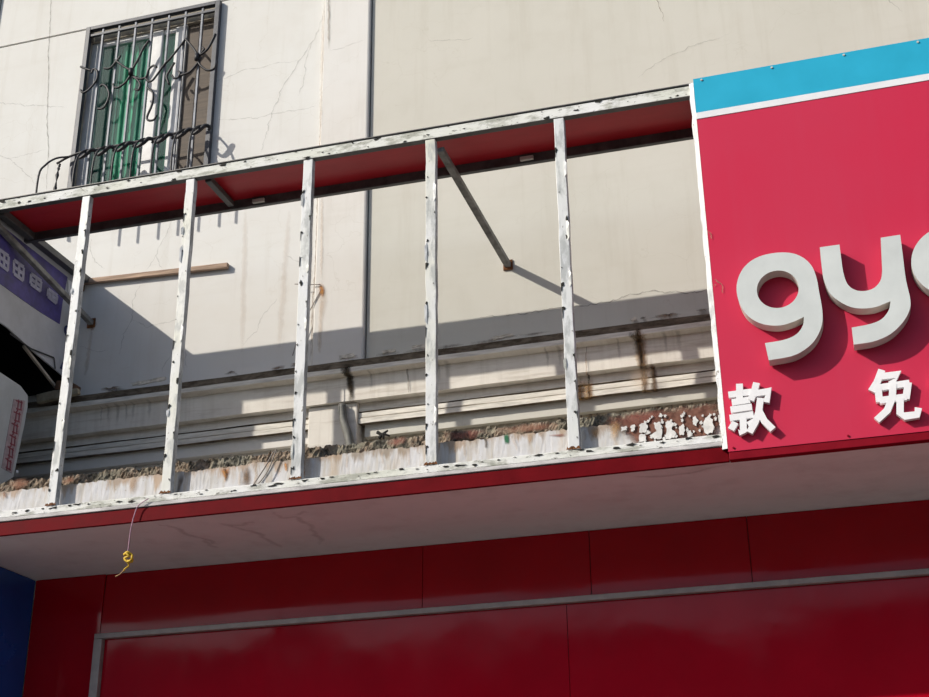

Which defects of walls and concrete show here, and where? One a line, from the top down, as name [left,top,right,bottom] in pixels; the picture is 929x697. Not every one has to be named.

peeling [612,405,720,443]